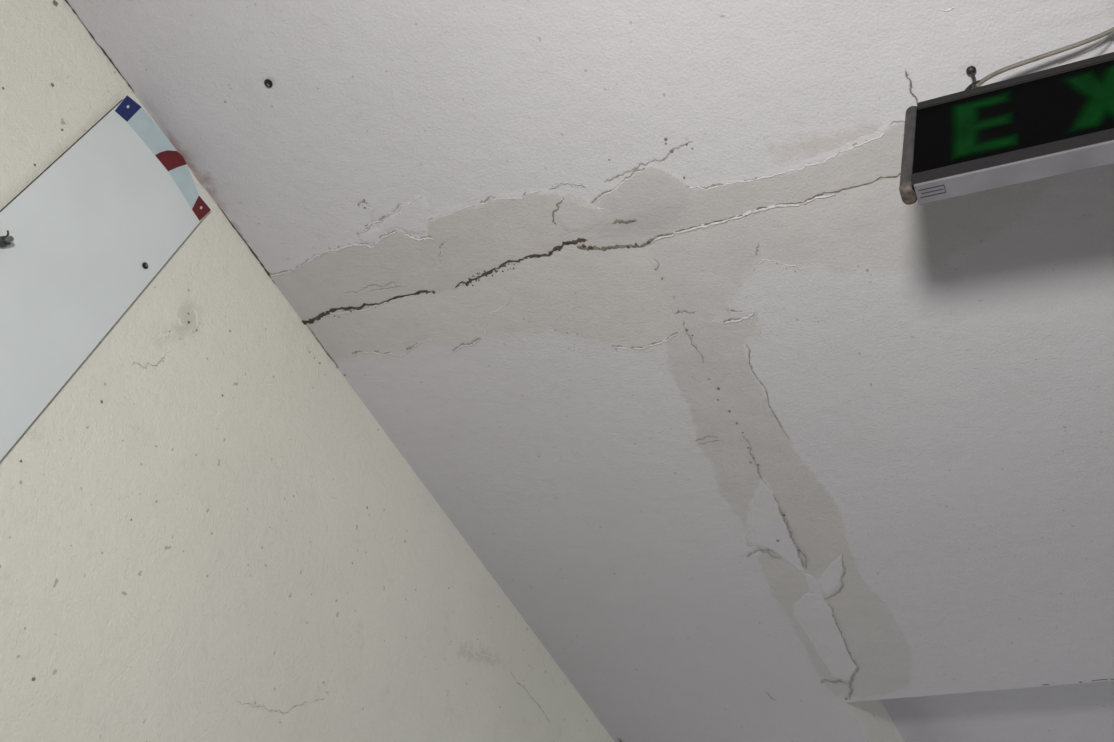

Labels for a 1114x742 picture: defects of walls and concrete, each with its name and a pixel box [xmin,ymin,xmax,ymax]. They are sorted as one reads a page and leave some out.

crack [548,138,693,190]
flaking render [269,114,920,701]
crack [302,173,901,569]
crack [822,604,859,700]